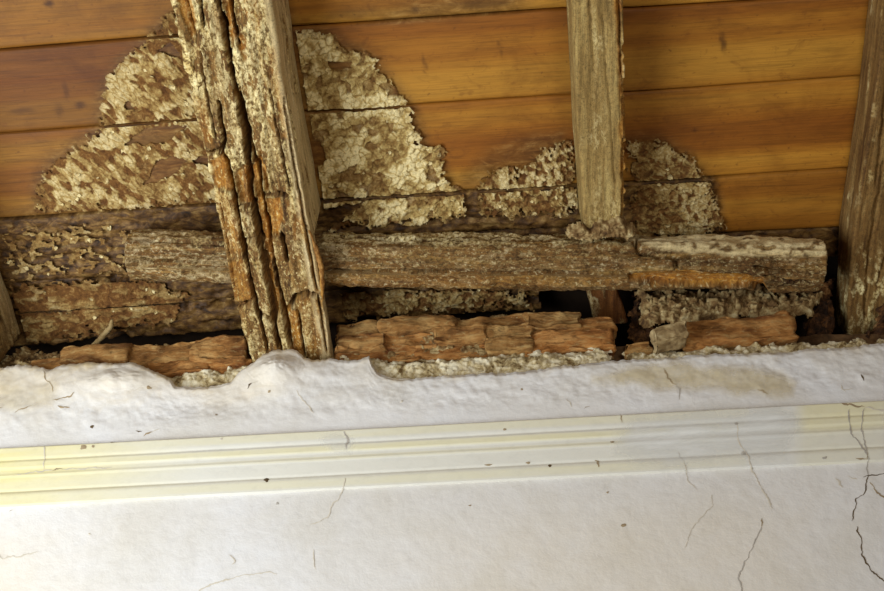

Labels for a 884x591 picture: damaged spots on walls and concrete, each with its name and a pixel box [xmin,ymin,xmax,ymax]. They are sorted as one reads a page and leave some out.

flaking render [334,287,884,379]
crack [737,425,772,591]
crack [836,375,884,581]